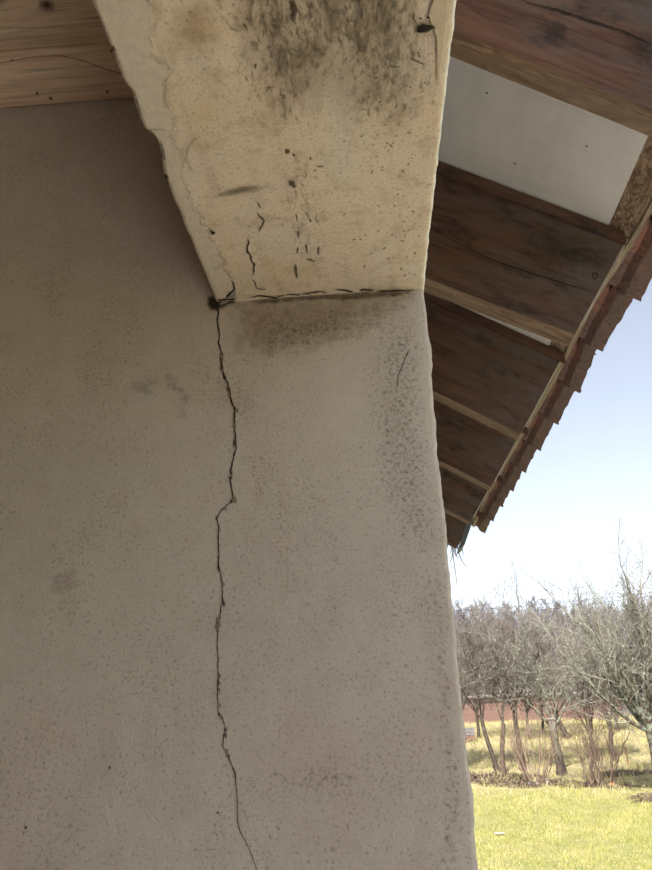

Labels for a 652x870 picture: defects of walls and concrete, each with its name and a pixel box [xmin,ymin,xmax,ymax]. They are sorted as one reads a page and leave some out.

leakage [243,0,406,79]
crack [246,203,413,302]
crack [215,309,257,870]